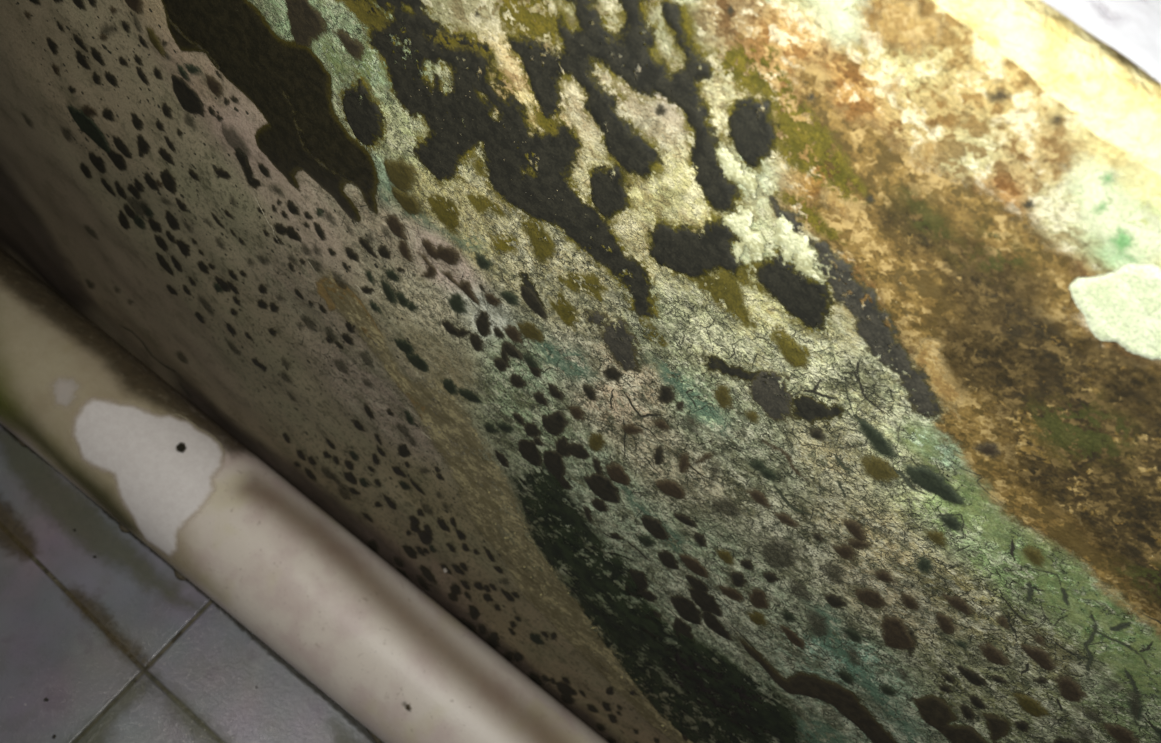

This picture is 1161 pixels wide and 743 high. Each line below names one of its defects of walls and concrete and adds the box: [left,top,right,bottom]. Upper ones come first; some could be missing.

damp [989,91,1010,102]
damp [41,0,965,743]
damp [973,442,1001,457]
damp [0,432,174,597]
damp [1023,546,1044,567]
damp [913,594,1048,743]
damp [1021,635,1144,743]